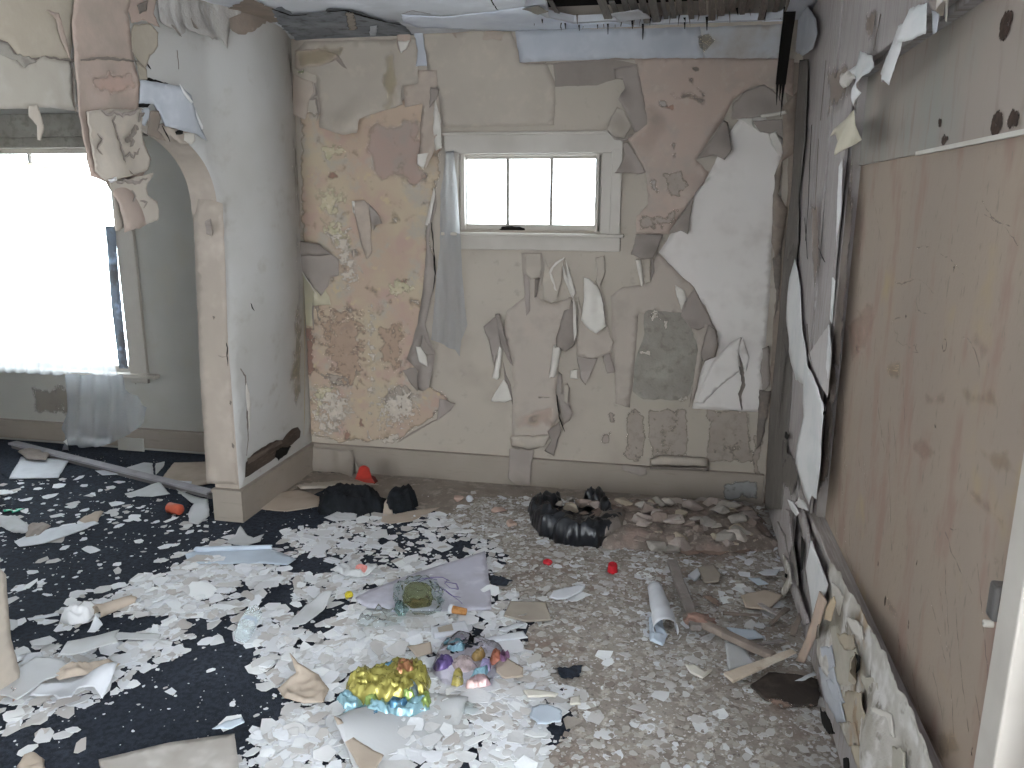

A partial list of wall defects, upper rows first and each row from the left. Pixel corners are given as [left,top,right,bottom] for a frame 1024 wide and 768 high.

peeling [0,0,159,232]
flaking render [158,123,195,145]
peeling [368,121,426,185]
peeling [157,0,783,63]
peeling [880,0,949,85]
peeling [194,199,301,485]
peeling [300,187,437,443]
peeling [542,256,615,385]
flaking render [609,117,783,463]
peeling [784,260,835,511]
flaking render [795,541,933,768]